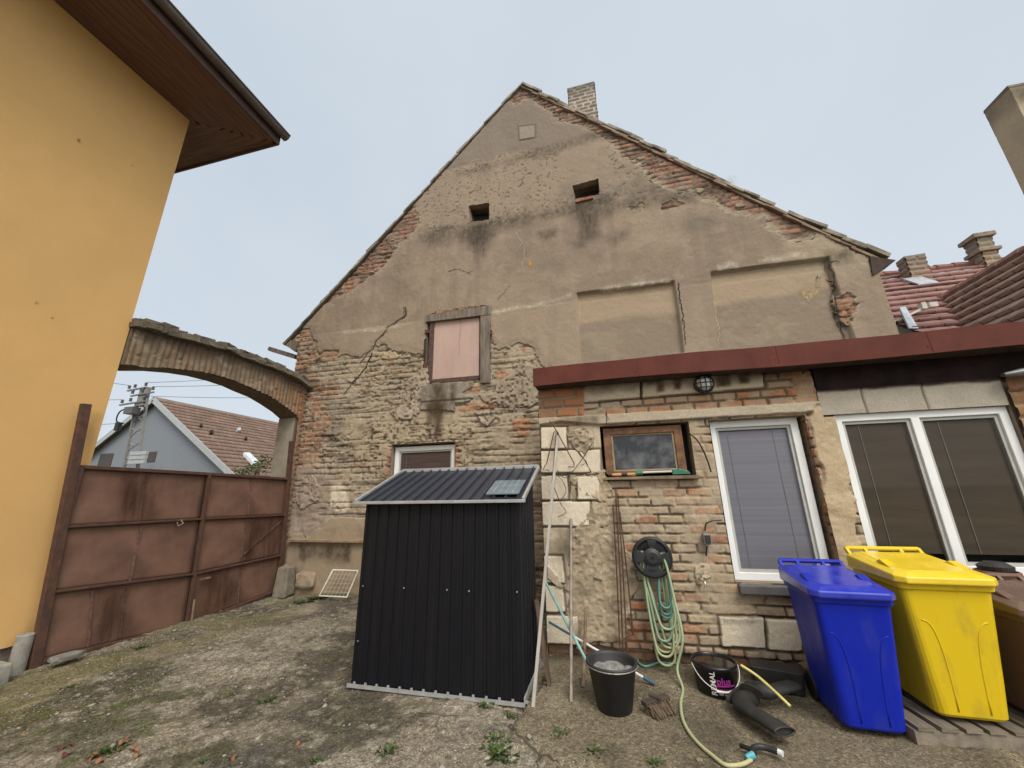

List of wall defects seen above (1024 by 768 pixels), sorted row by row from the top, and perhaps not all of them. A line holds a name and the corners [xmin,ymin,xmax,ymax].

flaking render [509,88,815,243]
flaking render [328,208,420,303]
crack [344,307,407,394]
crack [816,257,845,339]
flaking render [832,293,858,325]
flaking render [286,329,640,650]